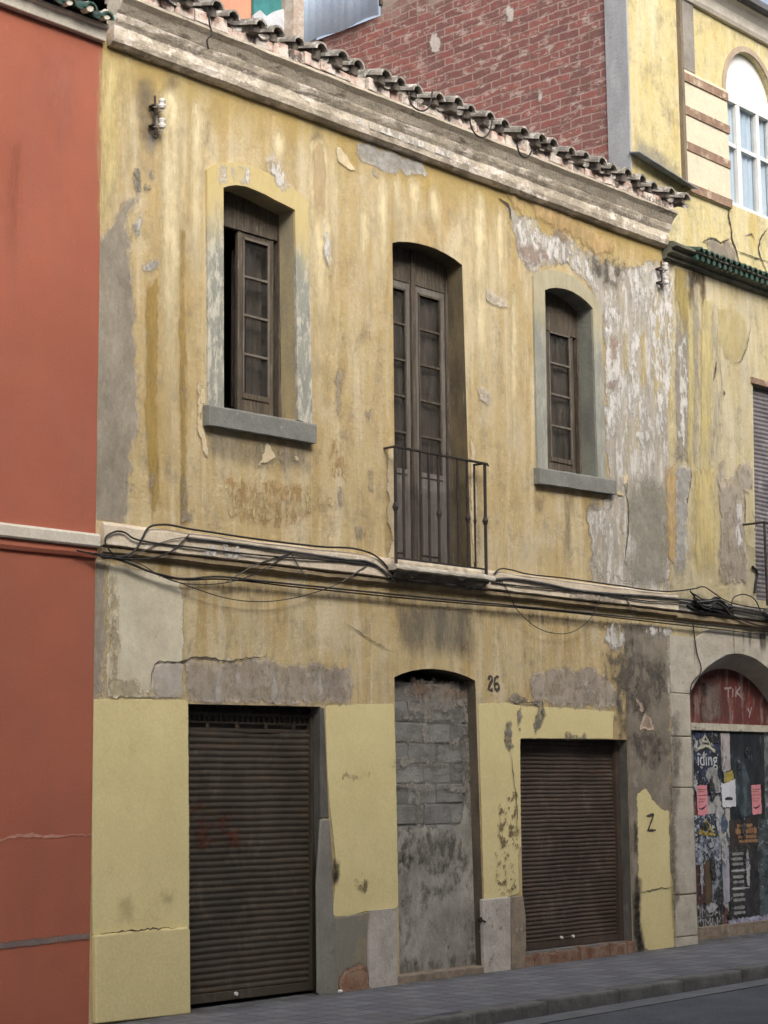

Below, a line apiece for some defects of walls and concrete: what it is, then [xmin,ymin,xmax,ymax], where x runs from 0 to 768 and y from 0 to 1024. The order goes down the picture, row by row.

peeling [336,143,426,177]
crack [702,213,768,271]
peeling [96,168,159,523]
peeling [506,206,692,603]
peeling [718,460,753,584]
peeling [94,561,353,705]
leakage [599,623,681,796]
crack [0,832,91,842]
peeling [495,792,519,894]
spalling [504,622,674,952]
spalling [339,963,371,992]